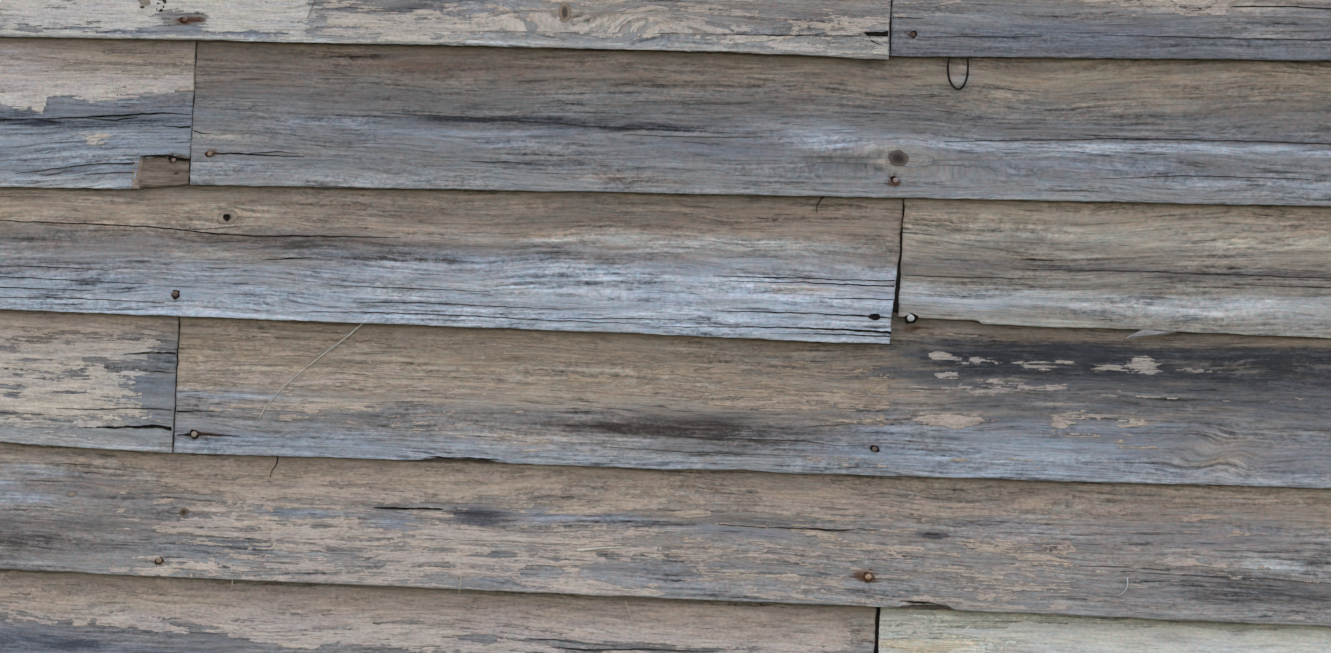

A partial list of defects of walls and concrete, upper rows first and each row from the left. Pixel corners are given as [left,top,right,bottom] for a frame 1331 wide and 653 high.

peeling [70,133,112,145]
spalling [132,155,190,189]
peeling [0,313,1331,653]